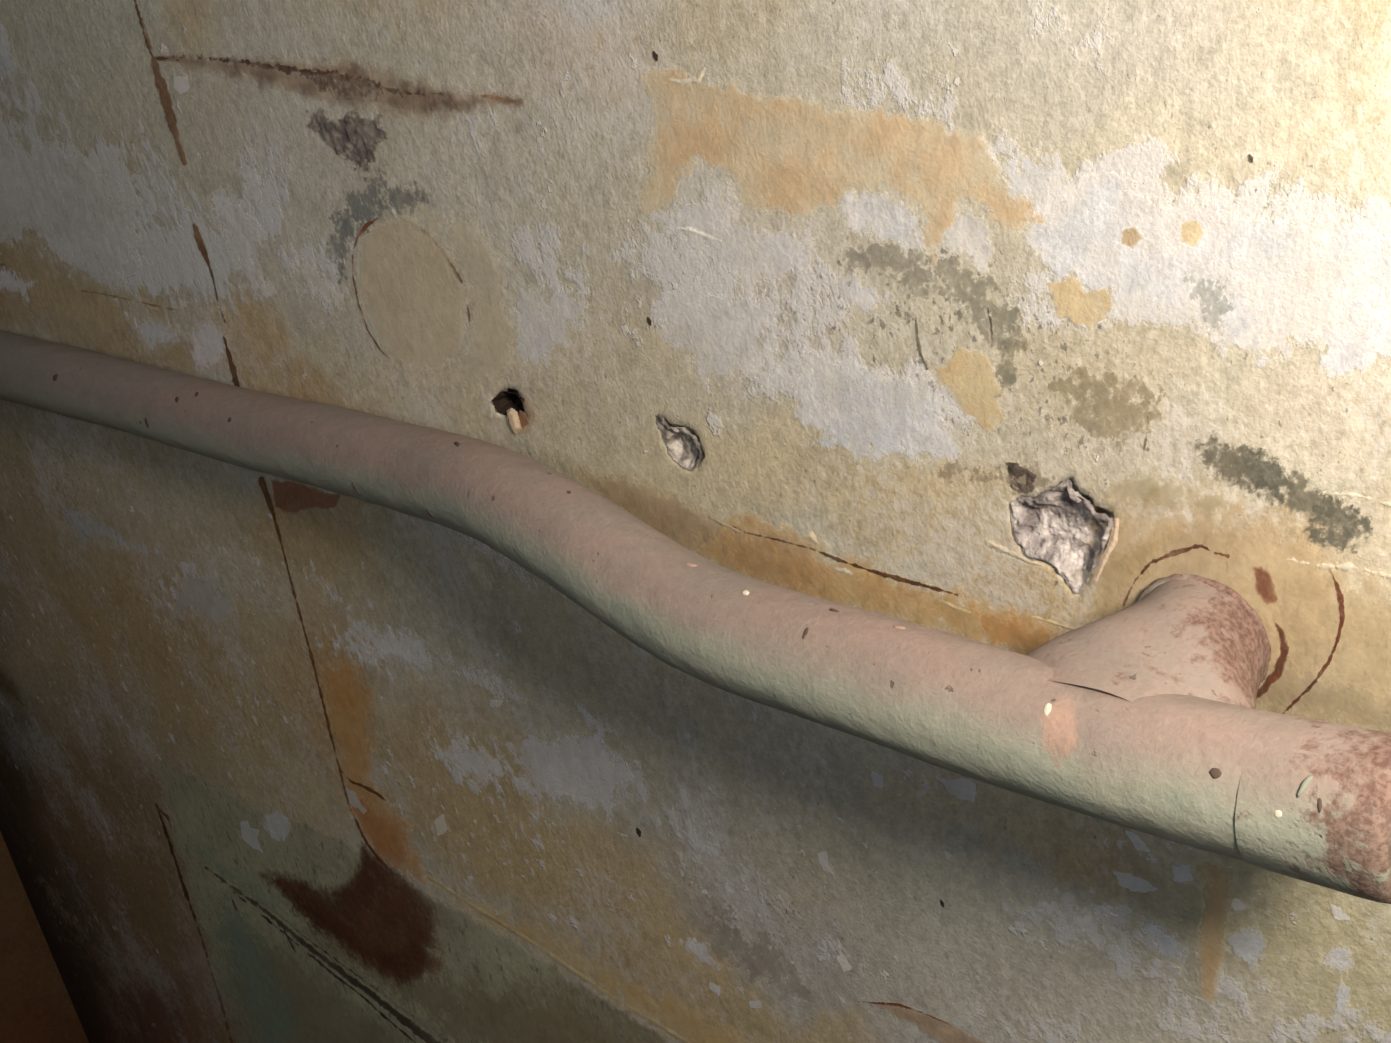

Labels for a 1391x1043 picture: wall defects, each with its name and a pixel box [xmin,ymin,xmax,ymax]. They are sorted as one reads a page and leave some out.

crack [134,0,187,165]
crack [80,290,176,310]
peeling [114,298,229,403]
crack [193,223,240,387]
spalling [656,413,703,471]
peeling [789,348,1004,469]
peeling [641,67,1391,377]
crack [258,477,386,811]
spalling [985,462,1119,594]
leakage [1092,430,1391,732]
corrosion [260,663,441,987]
crack [155,804,453,1043]